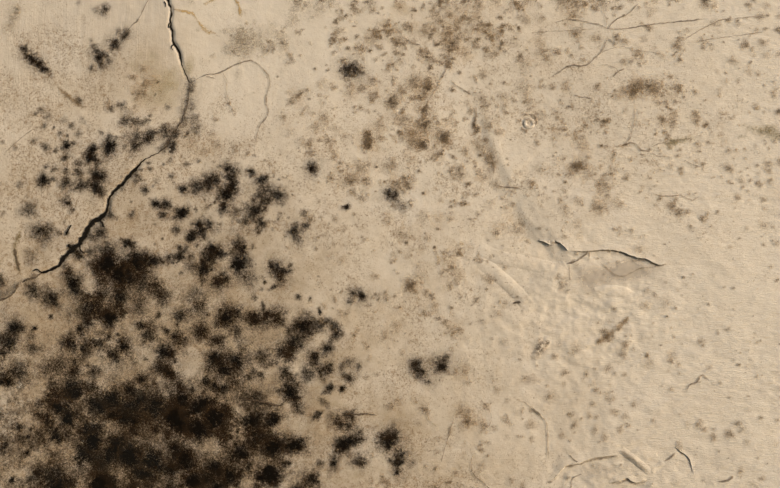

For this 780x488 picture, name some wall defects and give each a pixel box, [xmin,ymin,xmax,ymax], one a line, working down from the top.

damp [38,123,117,205]
crack [0,0,270,301]
damp [123,116,198,153]
damp [363,130,375,149]
damp [386,0,527,159]
damp [629,79,685,156]
peeling [539,237,667,287]
damp [0,162,365,488]
damp [376,430,413,475]
peeling [547,446,695,483]